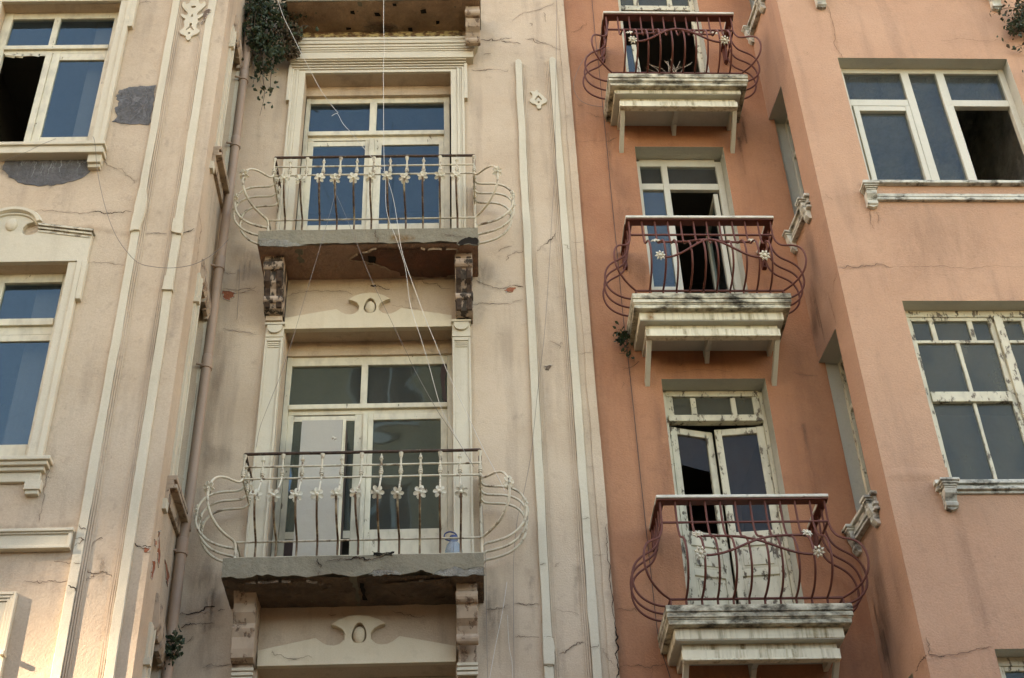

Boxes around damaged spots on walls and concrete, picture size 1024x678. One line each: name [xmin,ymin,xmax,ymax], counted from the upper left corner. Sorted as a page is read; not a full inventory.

crack [473,3,554,71]
peeling [348,236,480,279]
crack [26,524,112,591]
spalling [368,569,401,577]
crack [180,606,223,642]
crack [916,639,989,671]